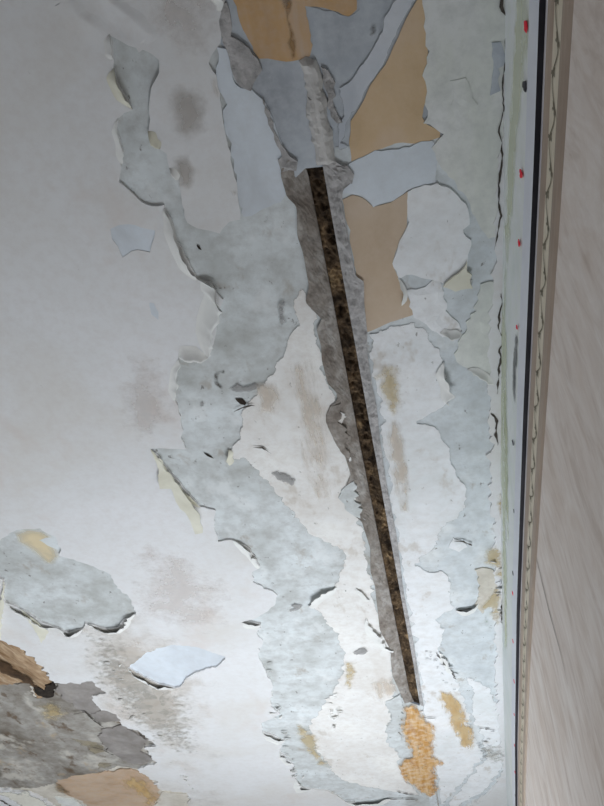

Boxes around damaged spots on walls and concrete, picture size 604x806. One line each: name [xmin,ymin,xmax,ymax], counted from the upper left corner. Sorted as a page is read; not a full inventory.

crack [498,0,506,15]
crack [495,63,505,247]
crack [495,295,503,393]
peeling [104,0,505,806]
flaking render [0,528,194,806]
rust [399,706,443,797]
rust [442,693,473,747]